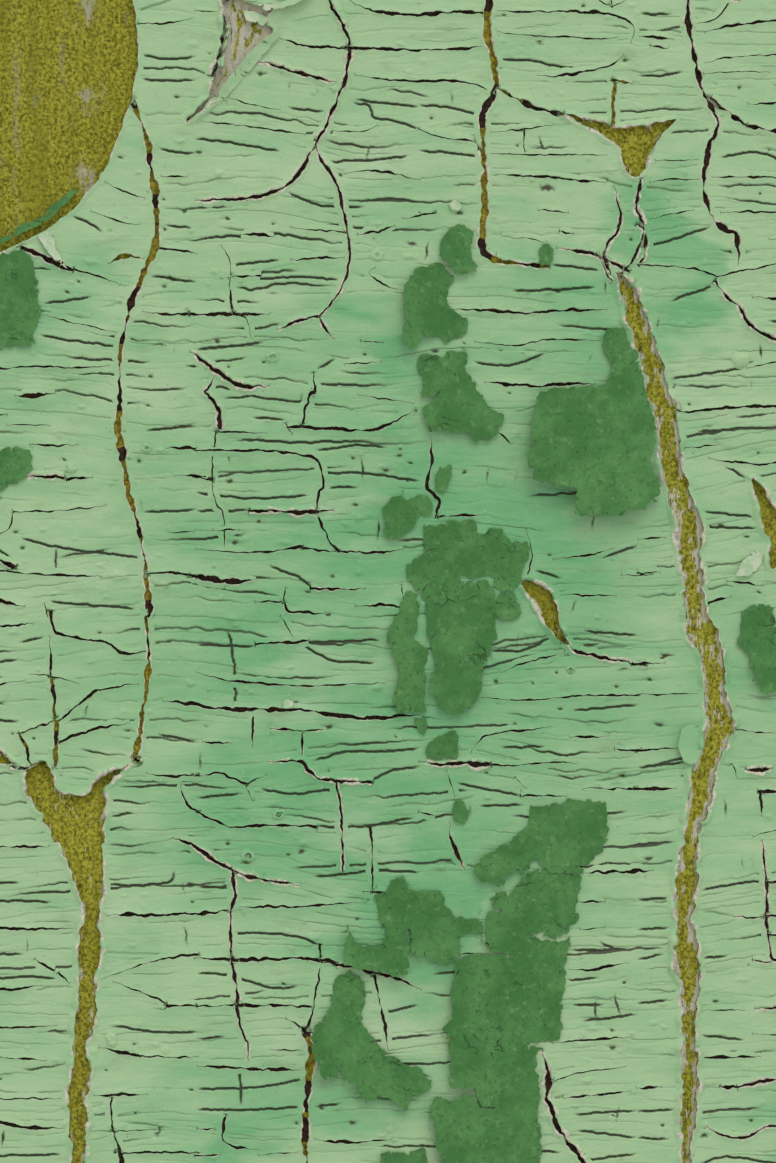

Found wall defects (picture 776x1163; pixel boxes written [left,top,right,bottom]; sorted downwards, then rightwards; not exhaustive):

peeling [0,0,144,348]
crack [0,0,776,872]
peeling [401,224,504,443]
crack [0,922,73,1064]
peeling [0,752,141,1163]
crack [91,826,422,1163]
peeling [311,798,609,1163]
peeling [382,465,570,759]
crack [539,1032,661,1163]
peeling [527,269,776,1163]
crack [702,1002,776,1094]
crack [729,725,776,969]